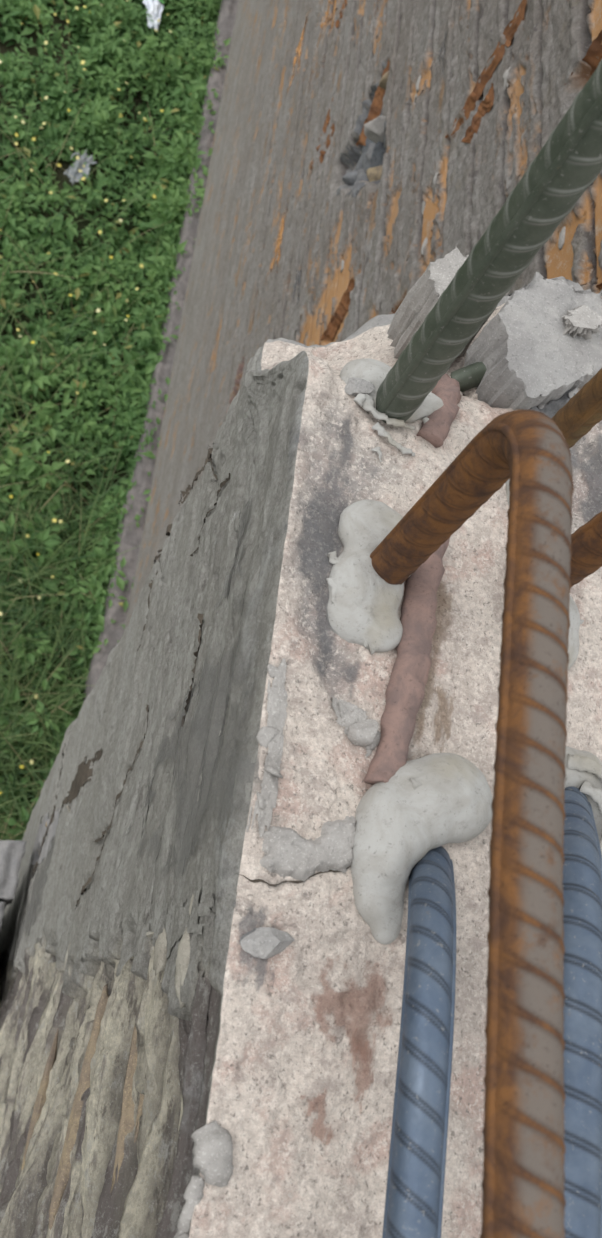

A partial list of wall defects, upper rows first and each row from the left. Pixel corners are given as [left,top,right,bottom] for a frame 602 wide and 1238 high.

spalling [310,59,390,197]
peeling [404,61,435,105]
peeling [445,0,527,198]
spalling [582,30,602,76]
peeling [406,164,444,261]
peeling [545,200,602,292]
peeling [292,248,355,346]
spalling [562,305,602,340]
spalling [529,387,578,418]
crack [136,443,230,654]
peeling [245,658,288,857]